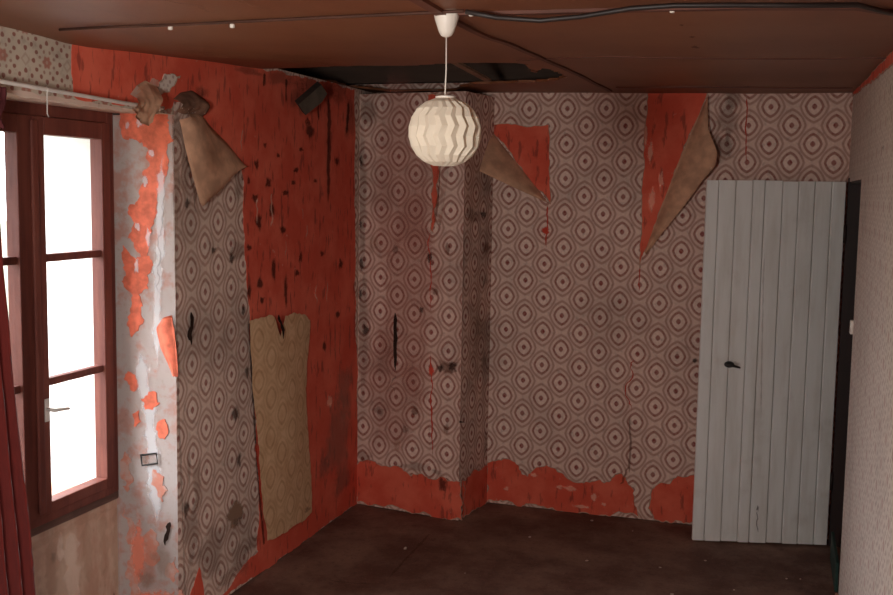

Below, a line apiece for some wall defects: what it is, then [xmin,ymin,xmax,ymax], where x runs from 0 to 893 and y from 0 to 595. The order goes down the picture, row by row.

peeling [7,90,174,337]
peeling [124,371,160,427]
peeling [156,419,169,439]
peeling [119,452,134,492]
peeling [151,469,168,502]
peeling [227,500,243,528]
peeling [122,513,183,595]